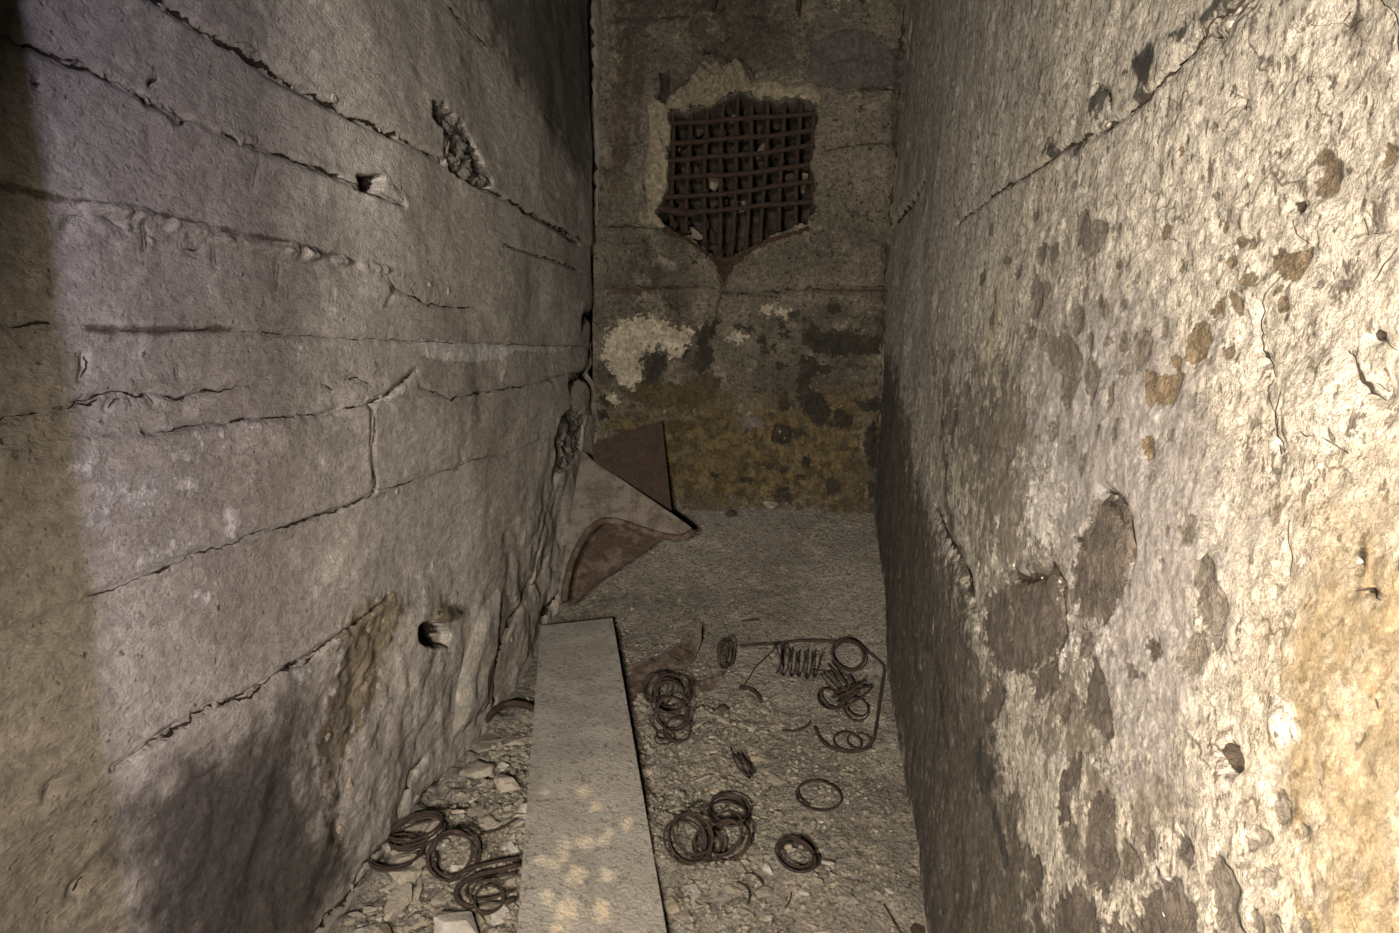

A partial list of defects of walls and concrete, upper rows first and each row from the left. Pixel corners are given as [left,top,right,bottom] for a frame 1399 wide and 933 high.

spalling [432,100,494,190]
spalling [645,57,821,228]
crack [960,0,1254,222]
flaking render [1315,146,1343,199]
crack [1311,0,1399,52]
crack [0,0,926,597]
corrosion [662,226,810,333]
crack [1261,275,1349,454]
crack [114,599,387,768]
water stain [596,302,1047,933]
water stain [1007,275,1230,796]
flaking render [921,165,1325,933]